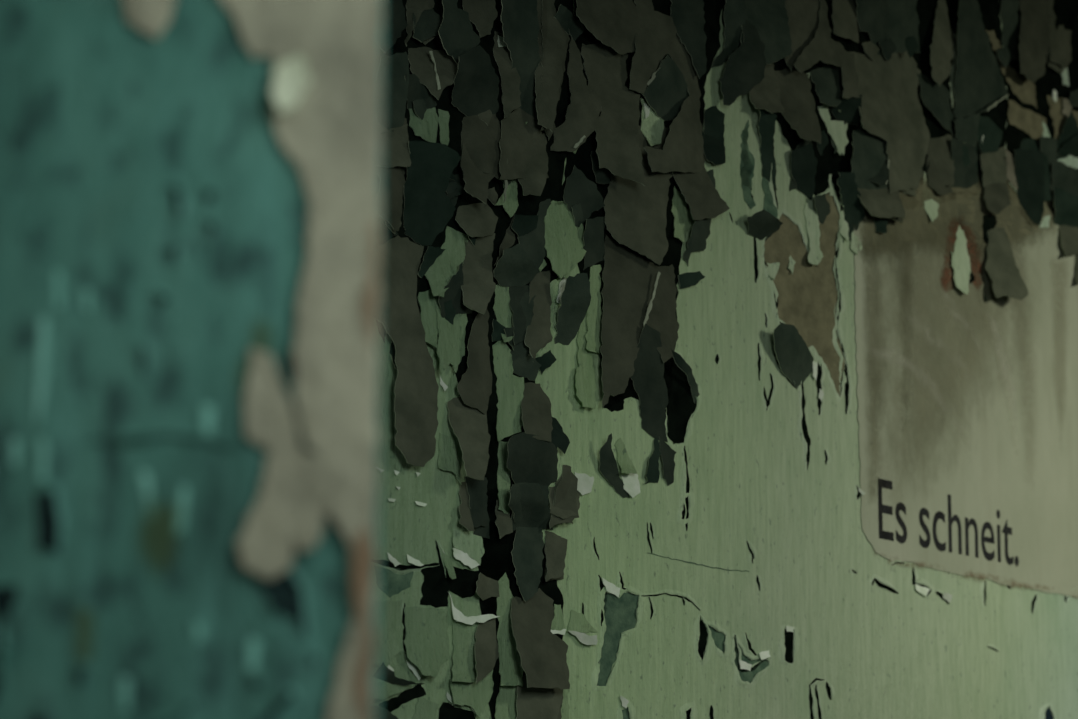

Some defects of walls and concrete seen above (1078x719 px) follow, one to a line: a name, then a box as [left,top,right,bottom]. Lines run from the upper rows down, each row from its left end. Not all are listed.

peeling [123,0,176,40]
corrosion [940,221,983,291]
peeling [222,0,1078,719]
damp [861,180,1054,453]
spalling [31,484,65,557]
spalling [0,581,22,693]